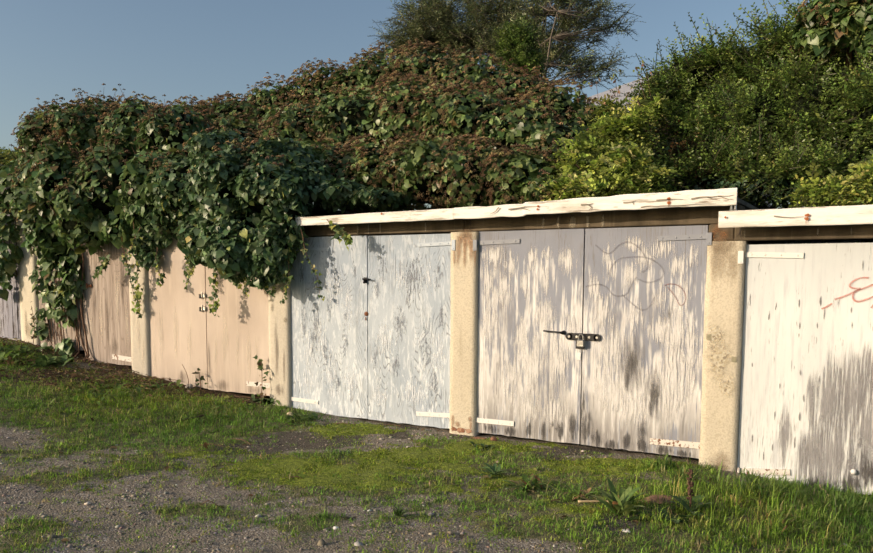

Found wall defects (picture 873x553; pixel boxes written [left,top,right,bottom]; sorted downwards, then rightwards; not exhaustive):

water stain [625,343,640,389]
water stain [525,373,691,458]
water stain [838,460,873,492]